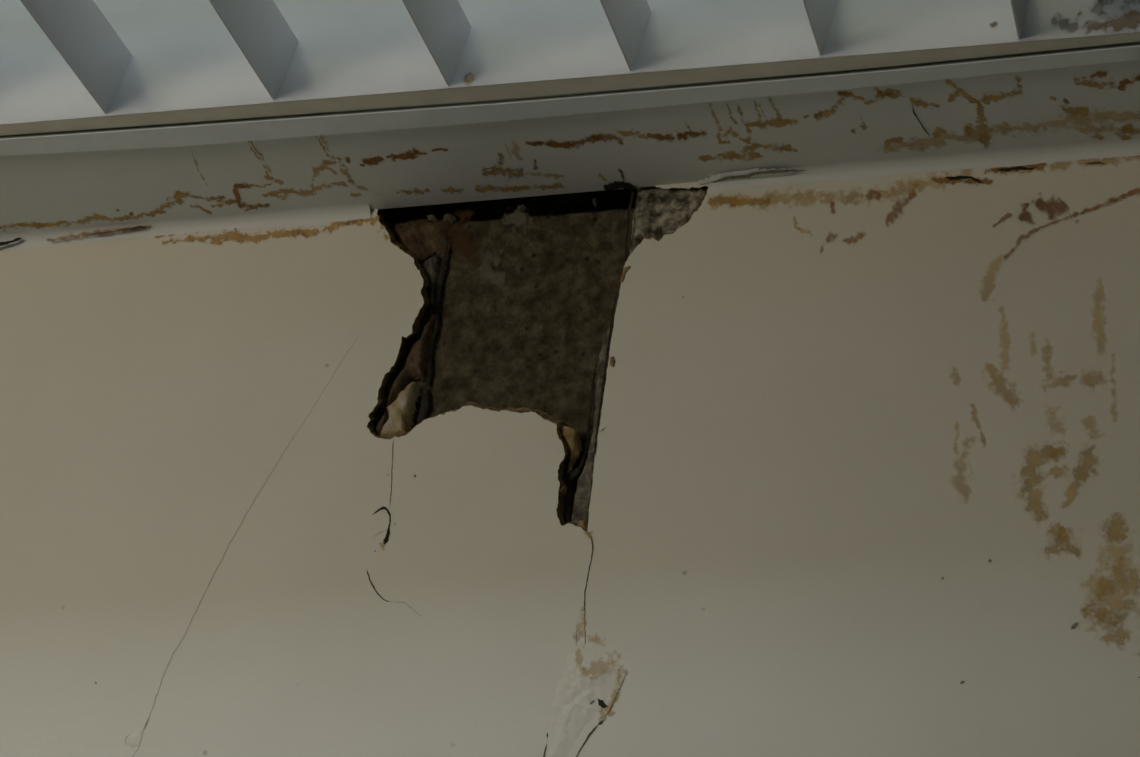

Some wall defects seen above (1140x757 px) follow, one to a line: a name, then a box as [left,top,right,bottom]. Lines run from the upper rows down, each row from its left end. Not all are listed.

damp [699,144,798,161]
damp [155,216,391,245]
damp [262,181,361,200]
damp [397,184,562,195]
damp [709,196,770,206]
damp [886,183,918,223]
crack [1004,186,1140,258]
spalling [367,167,806,532]
crack [125,338,358,757]
crack [367,446,422,617]
damp [1022,446,1096,557]
crack [576,531,594,644]